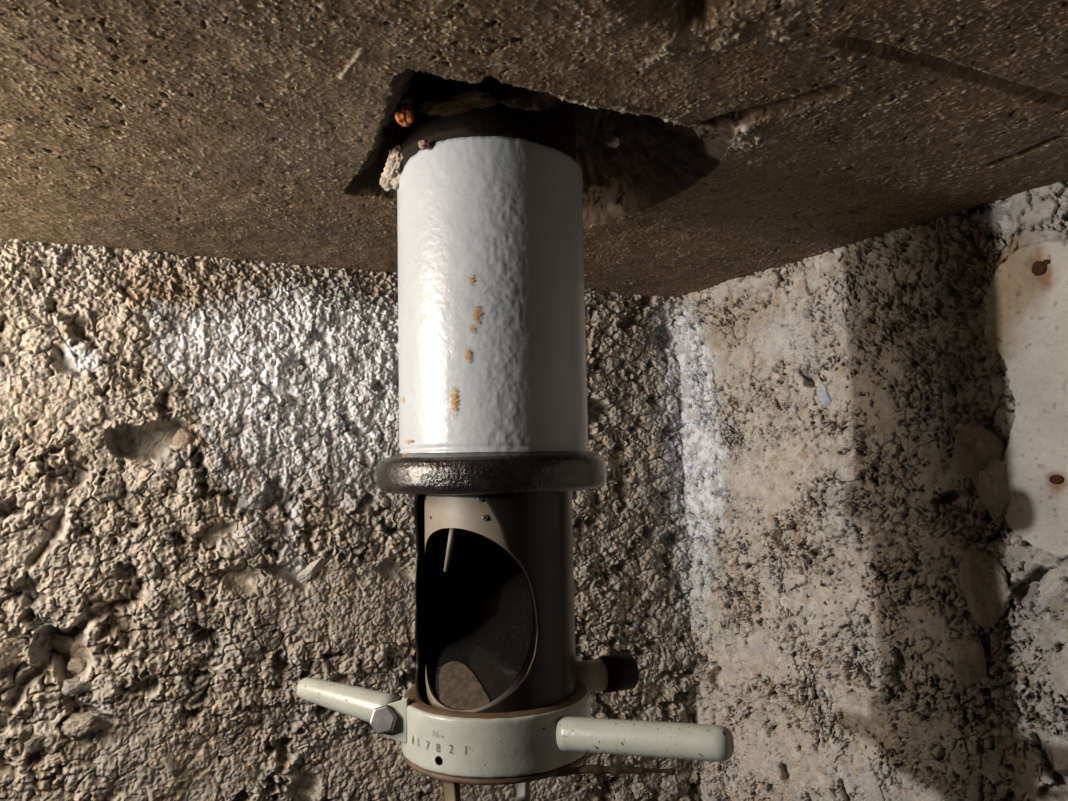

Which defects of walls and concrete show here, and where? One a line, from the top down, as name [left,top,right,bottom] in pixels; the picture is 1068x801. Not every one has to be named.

spalling [343,68,737,228]
rust [992,256,1050,344]
rust [1049,475,1064,490]